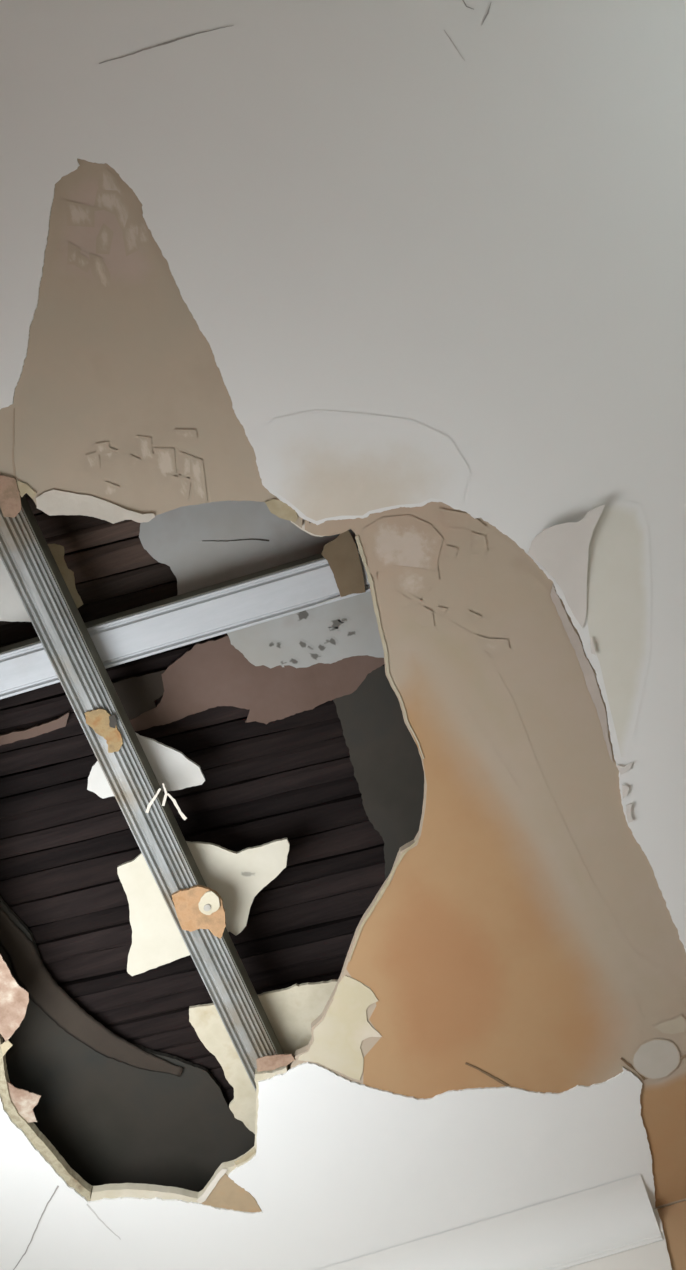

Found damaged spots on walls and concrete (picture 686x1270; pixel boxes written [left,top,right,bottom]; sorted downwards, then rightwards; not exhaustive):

crack [99,25,234,64]
spalling [265,499,298,522]
spalling [295,610,313,622]
spalling [266,616,359,667]
peeling [528,505,605,655]
damp [586,499,652,757]
damp [346,651,644,1099]
spalling [0,1034,288,1203]
damp [640,1068,686,1207]
crack [13,1186,59,1270]
crack [86,1204,121,1240]